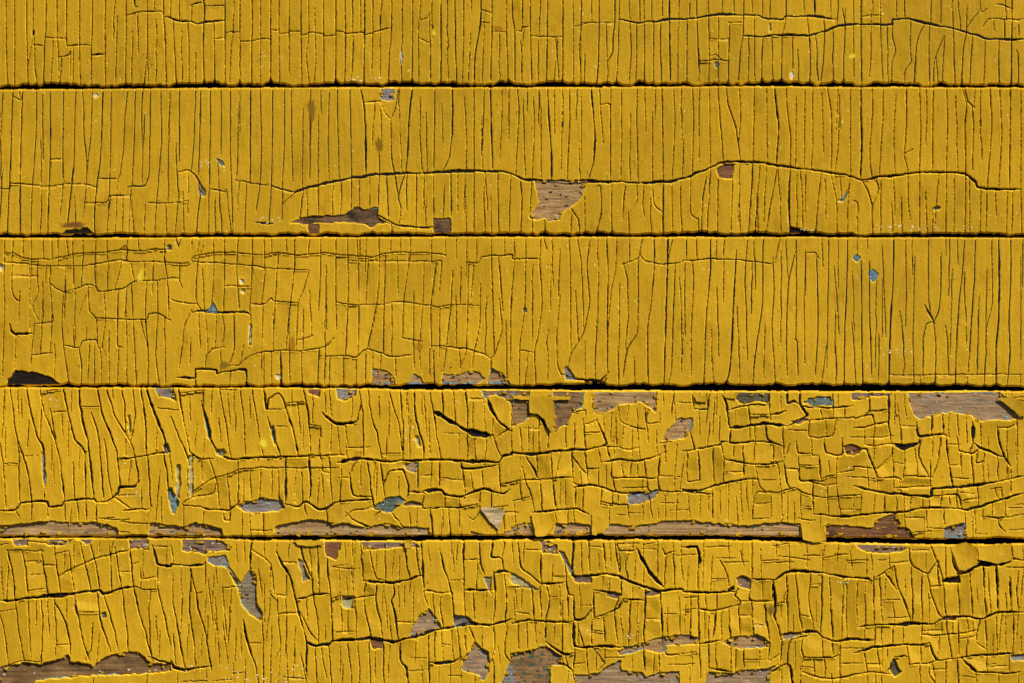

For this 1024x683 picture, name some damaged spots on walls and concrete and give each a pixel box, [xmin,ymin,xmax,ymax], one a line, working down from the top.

peeling [291,207,387,233]
peeling [529,179,588,221]
crack [0,0,1024,543]
peeling [7,370,59,384]
peeling [442,366,659,432]
peeling [908,392,1024,421]
peeling [0,455,263,621]
crack [0,519,1023,683]
peeling [0,652,172,683]
peeling [502,647,564,683]
peeling [574,635,699,683]
peeling [705,666,775,683]